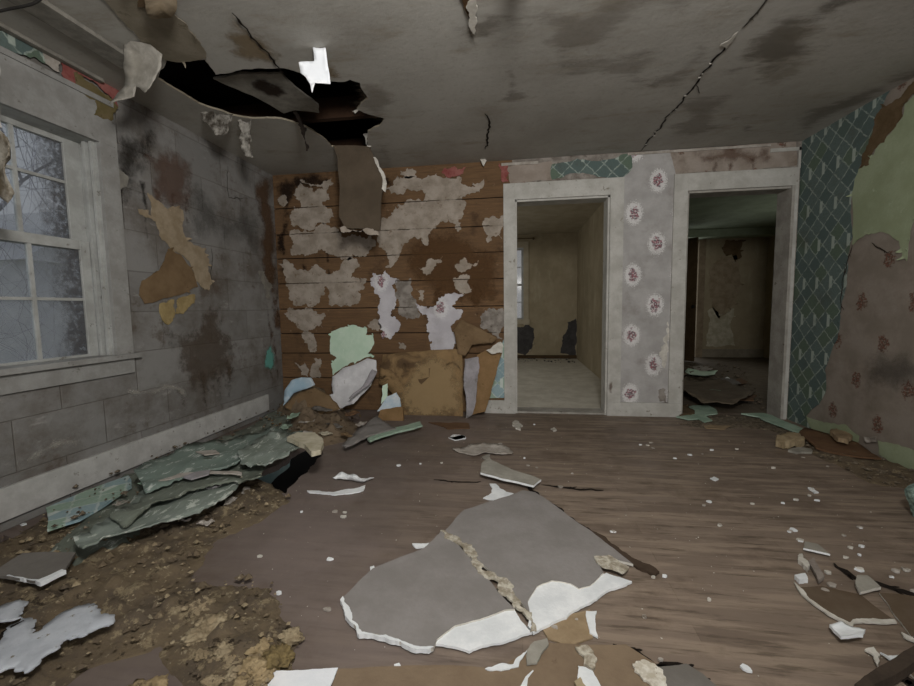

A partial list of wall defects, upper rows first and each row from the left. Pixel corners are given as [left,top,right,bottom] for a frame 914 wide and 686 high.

peeling [104,0,206,68]
crack [642,0,767,150]
water stain [120,136,151,176]
peeling [846,95,914,261]
flaking render [159,294,196,325]
water stain [179,314,232,387]
peeling [328,325,374,375]
flaking render [517,325,535,355]